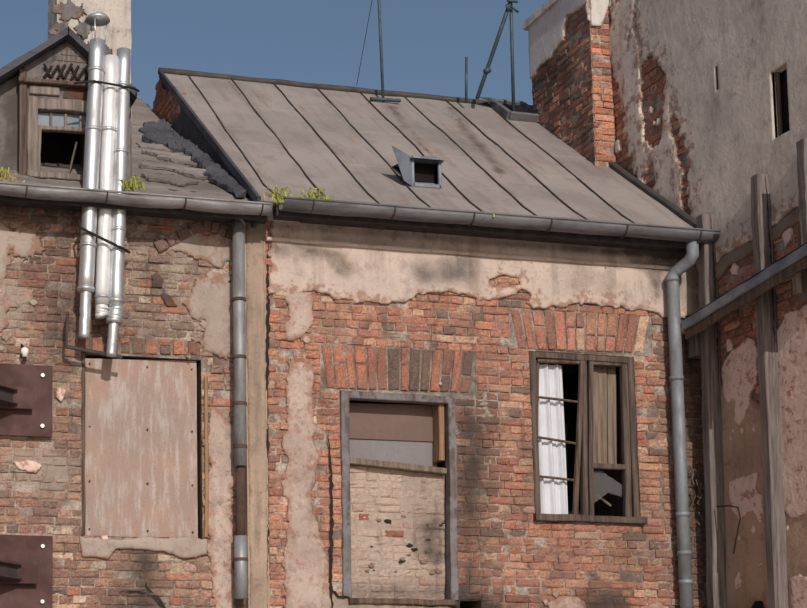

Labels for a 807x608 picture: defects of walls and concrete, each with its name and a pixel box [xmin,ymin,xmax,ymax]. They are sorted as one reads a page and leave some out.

spalling [48,0,94,46]
spalling [532,5,658,189]
spalling [641,56,691,215]
peeling [0,219,46,308]
spalling [490,275,533,309]
spalling [718,253,755,297]
spalling [773,225,798,262]
peeling [719,299,759,441]
peeling [775,271,807,531]